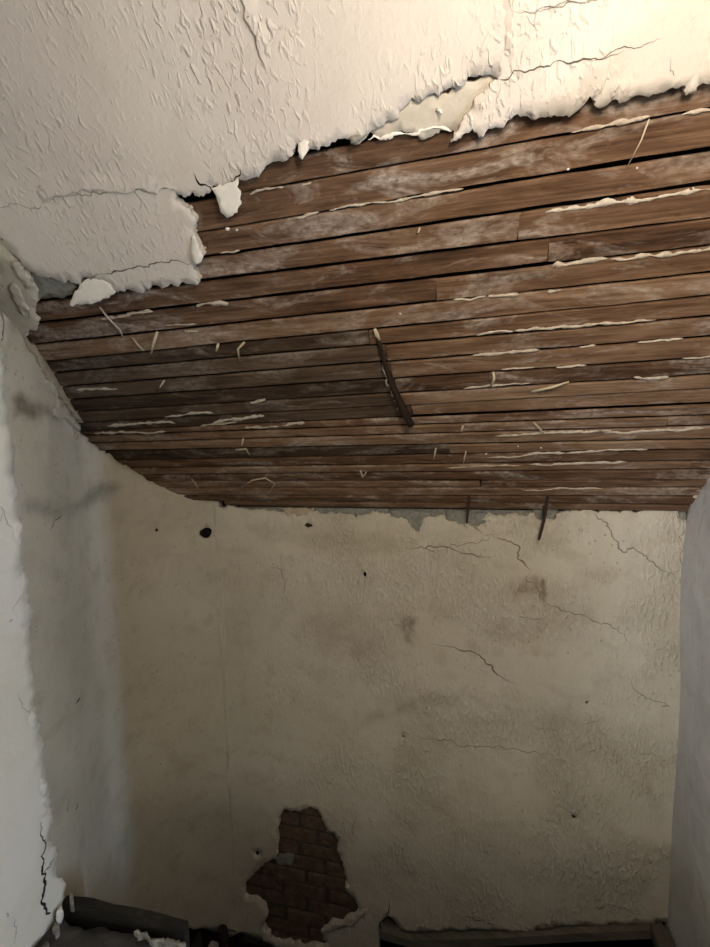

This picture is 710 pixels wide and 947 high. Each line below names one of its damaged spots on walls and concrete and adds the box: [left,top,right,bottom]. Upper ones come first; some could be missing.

crack [241,0,271,83]
crack [500,0,658,81]
peeling [298,139,309,159]
peeling [349,74,497,145]
peeling [211,179,242,218]
peeling [30,272,116,307]
flaking render [22,337,83,440]
crack [405,526,631,647]
crack [594,513,685,584]
crack [430,643,511,683]
crack [40,829,53,915]
flaking render [243,807,368,947]